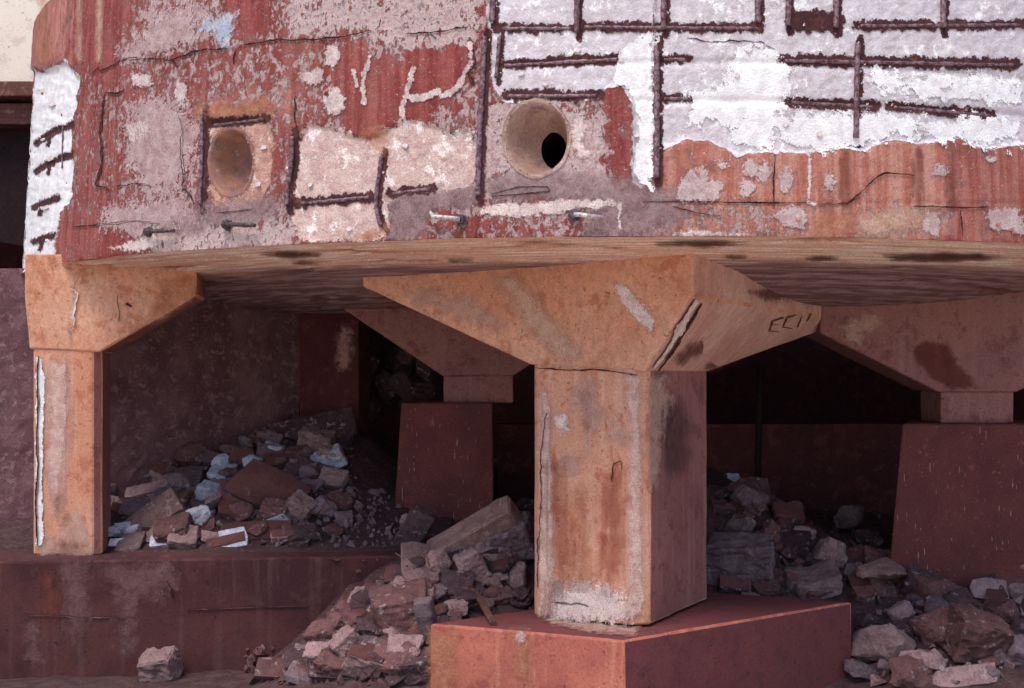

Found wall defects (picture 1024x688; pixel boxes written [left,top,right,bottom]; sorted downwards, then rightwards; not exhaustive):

spalling [23,59,82,272]
crack [92,30,369,190]
spalling [98,41,477,266]
spalling [486,0,1024,230]
crack [613,33,1024,216]
crack [914,206,988,235]
crack [534,300,702,375]
water stain [915,341,976,389]
crack [536,413,588,607]
water stain [537,375,691,634]